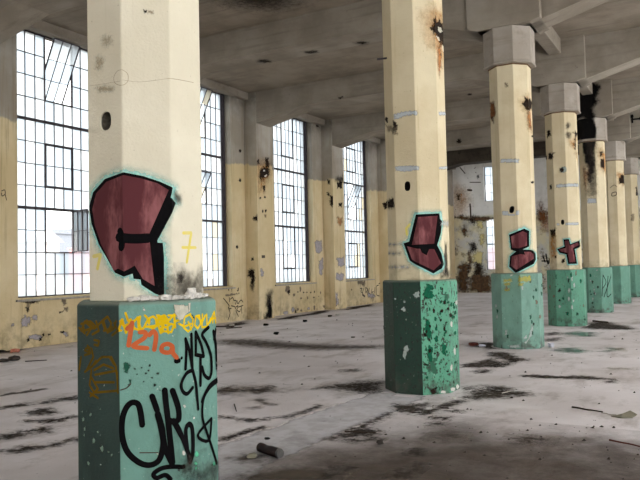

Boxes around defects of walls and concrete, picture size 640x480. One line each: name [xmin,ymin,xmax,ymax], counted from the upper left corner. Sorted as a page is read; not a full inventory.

corrosion [430,11,444,76]
corrosion [522,96,532,127]
corrosion [257,158,270,198]
water stain [585,142,596,194]
peeling [336,257,345,281]
peeling [413,215,491,373]